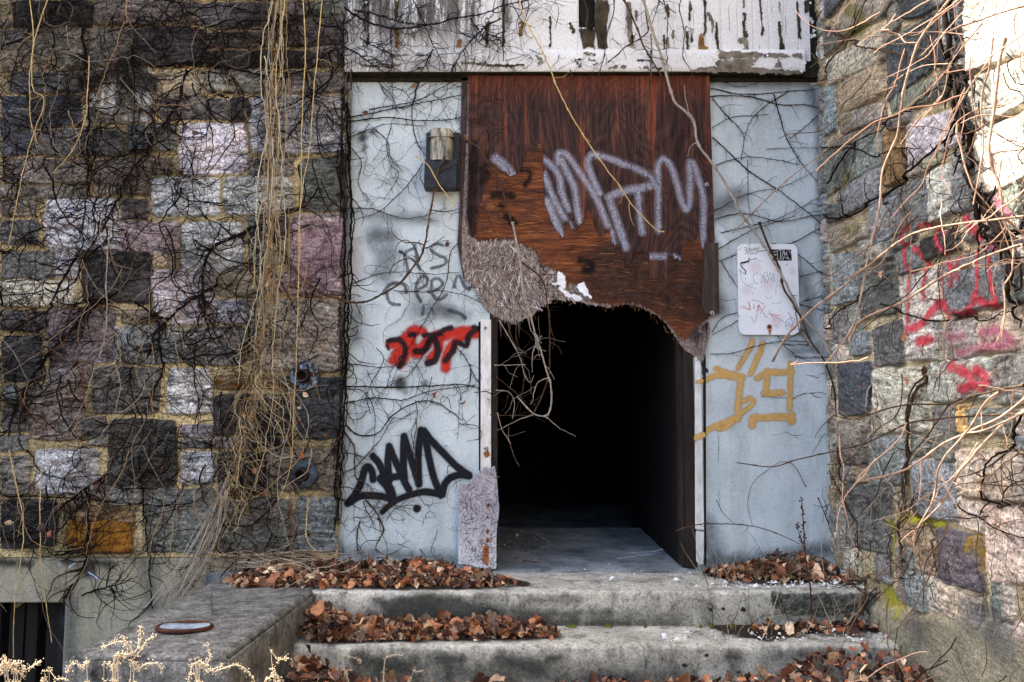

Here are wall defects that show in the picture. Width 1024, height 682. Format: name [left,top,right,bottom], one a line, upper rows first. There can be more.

peeling [359,0,424,69]
peeling [485,0,506,46]
peeling [458,55,542,68]
peeling [568,0,662,70]
peeling [661,0,818,75]
peeling [552,271,592,301]